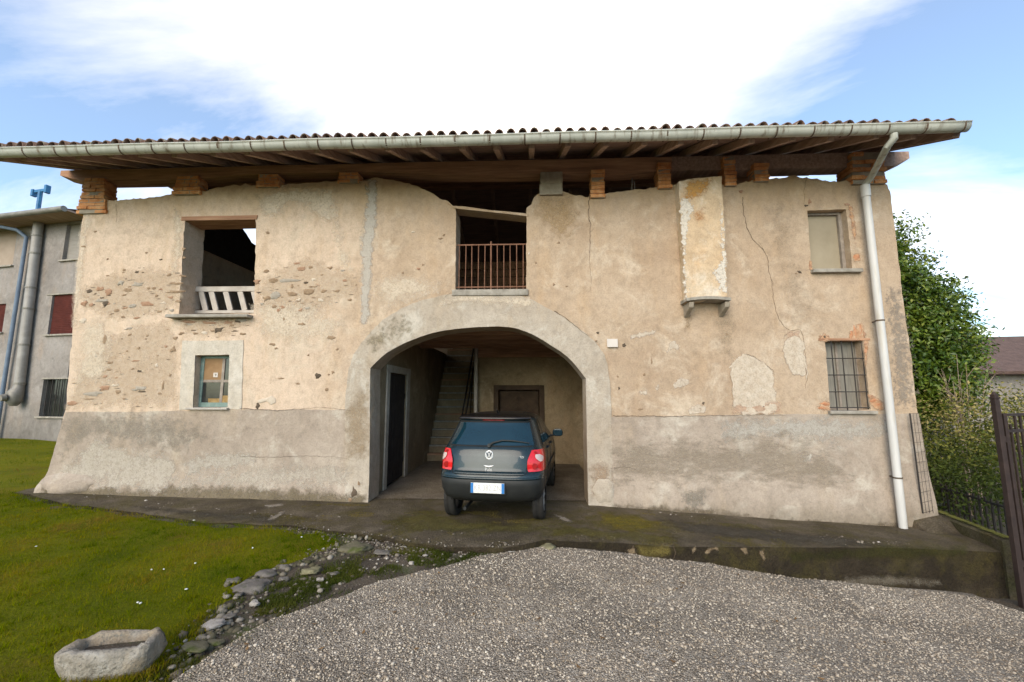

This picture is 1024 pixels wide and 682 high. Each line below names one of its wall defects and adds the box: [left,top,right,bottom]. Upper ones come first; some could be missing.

peeling [679,198,694,299]
peeling [713,211,729,293]
flaking render [66,214,250,408]
flaking render [254,262,357,350]
flaking render [729,354,779,416]
flaking render [783,332,808,378]
spalling [849,323,869,365]
damp [844,577,937,585]